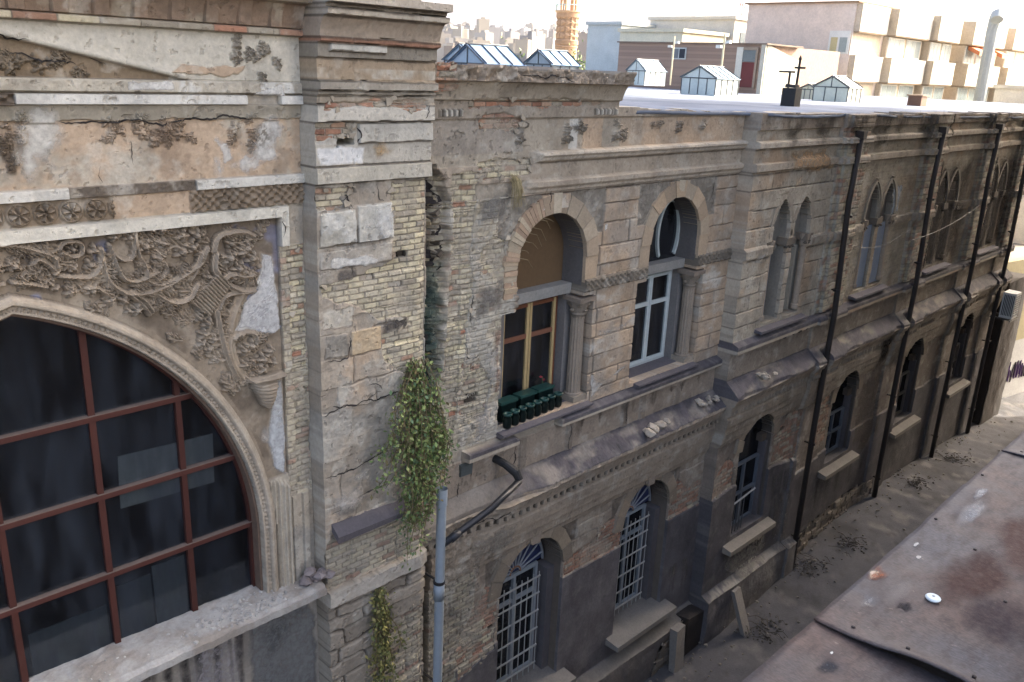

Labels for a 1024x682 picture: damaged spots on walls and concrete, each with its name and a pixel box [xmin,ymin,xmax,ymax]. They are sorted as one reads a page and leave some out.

crack [59,114,251,162]
spalling [315,95,426,141]
spalling [430,157,534,465]
spalling [240,244,310,488]
crack [325,383,399,417]
crack [326,450,389,514]
spalling [666,475,701,522]